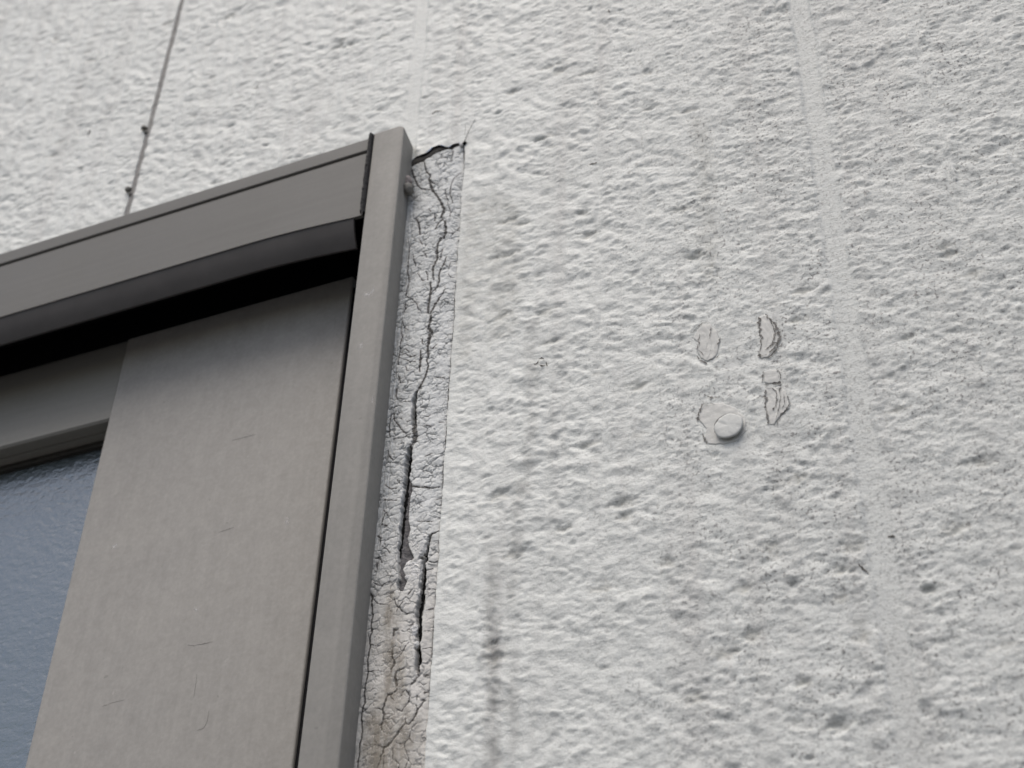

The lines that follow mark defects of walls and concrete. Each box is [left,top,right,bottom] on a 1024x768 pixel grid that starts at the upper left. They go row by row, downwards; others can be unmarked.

crack [357,118,476,768]
spalling [693,322,721,364]
spalling [697,394,747,445]
spalling [757,314,790,425]